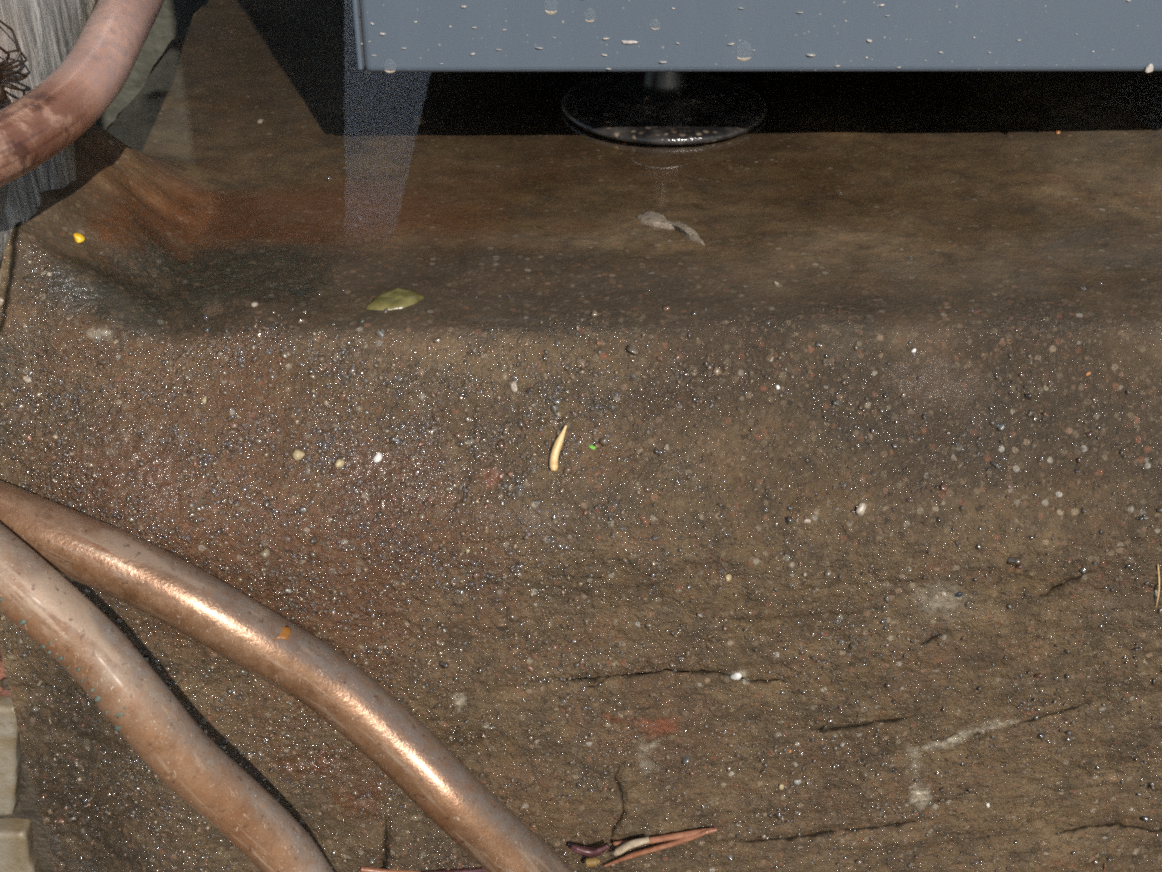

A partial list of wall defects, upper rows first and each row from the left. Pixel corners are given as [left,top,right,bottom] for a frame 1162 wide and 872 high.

water stain [1108,75,1162,127]
crack [563,644,783,687]
crack [813,718,907,732]
water stain [908,723,1005,758]
water stain [910,786,929,807]